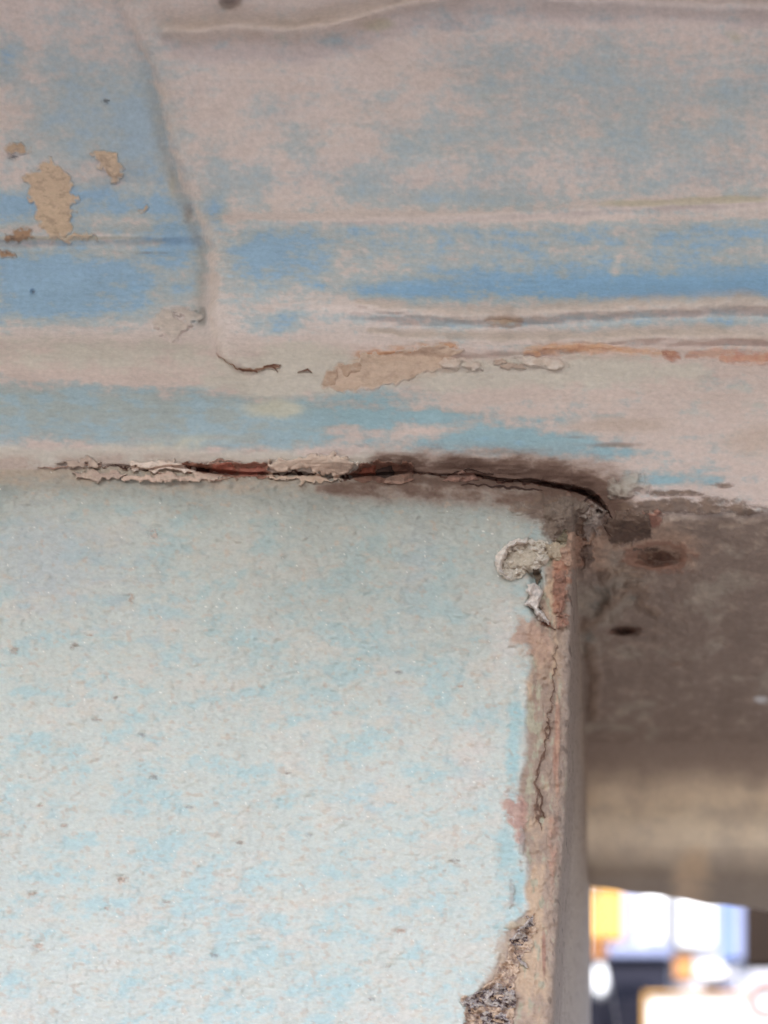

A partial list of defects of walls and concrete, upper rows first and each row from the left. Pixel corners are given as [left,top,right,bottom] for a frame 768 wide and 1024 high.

peeling [0,140,99,259]
peeling [88,150,126,185]
spalling [319,343,571,396]
crack [37,457,353,482]
peeling [53,451,415,487]
crack [414,468,613,536]
damp [311,436,768,550]
corrosion [614,538,703,578]
crack [533,644,559,831]
spalling [459,912,538,1024]